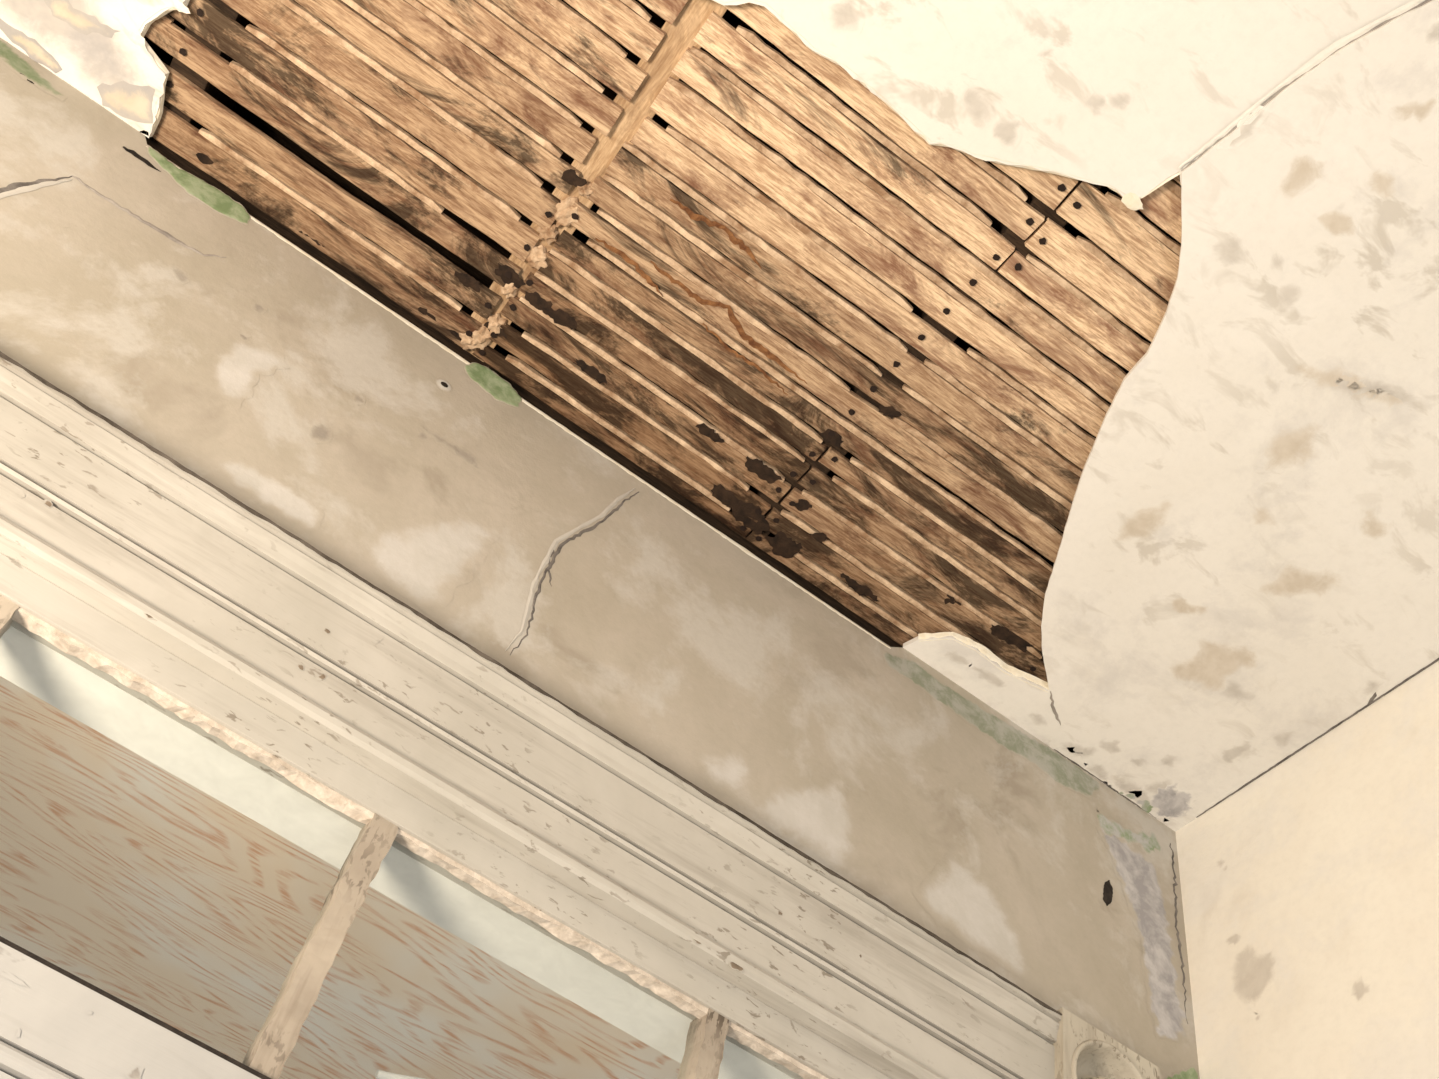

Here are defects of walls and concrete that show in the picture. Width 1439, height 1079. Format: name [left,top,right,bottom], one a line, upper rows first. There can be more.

peeling [0,29,122,120]
crack [1178,0,1432,171]
crack [0,175,224,258]
crack [505,488,639,655]
peeling [128,0,1199,1043]
peeling [1165,1058,1199,1079]